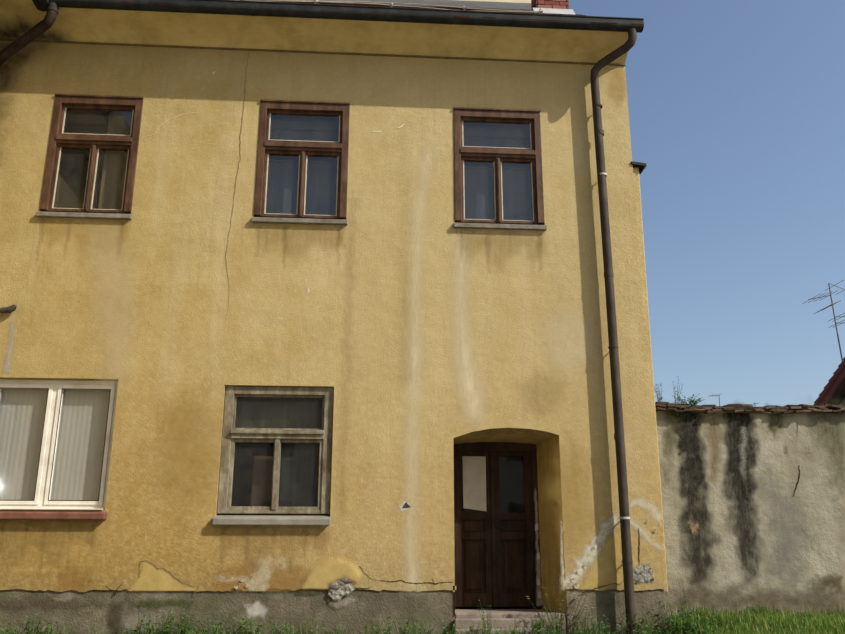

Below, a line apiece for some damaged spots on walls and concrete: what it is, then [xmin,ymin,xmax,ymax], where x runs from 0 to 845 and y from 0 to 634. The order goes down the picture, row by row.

peeling [630,499,661,549]
peeling [561,514,620,588]
crack [106,560,194,596]
spalling [328,577,355,607]
crack [355,566,444,589]
spalling [633,564,654,583]